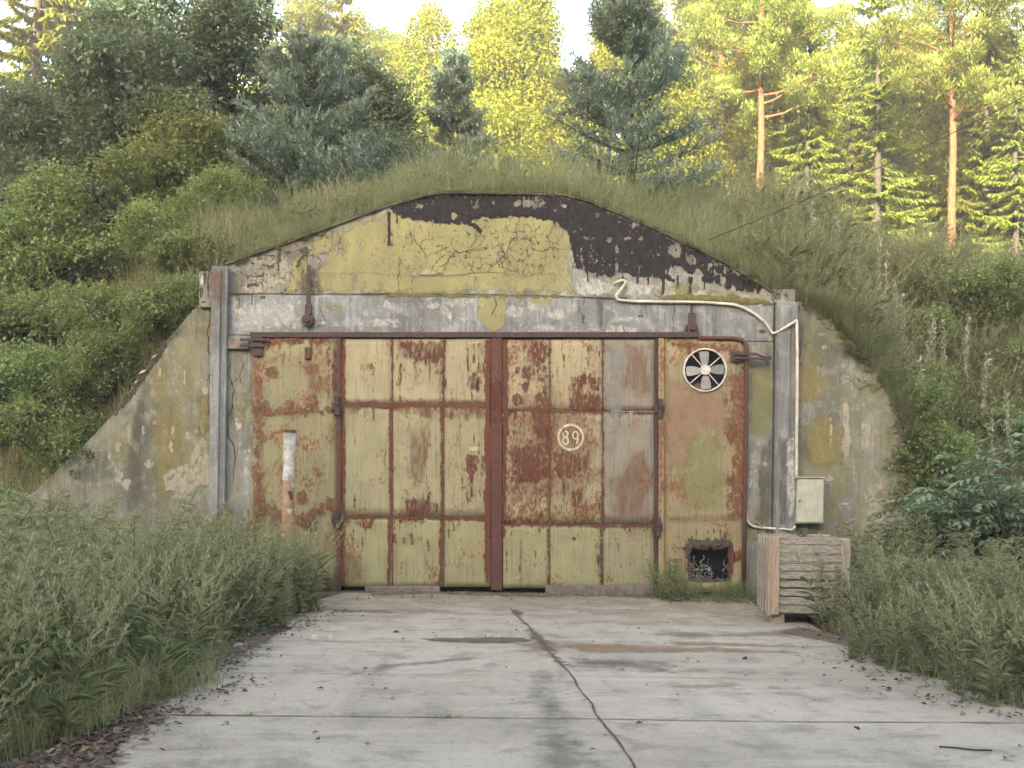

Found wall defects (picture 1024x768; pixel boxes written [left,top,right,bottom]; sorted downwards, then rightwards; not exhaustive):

peeling [235,212,678,306]
peeling [107,421,156,491]
peeling [163,418,209,498]
corrosion [251,338,337,541]
corrosion [345,496,373,551]
crack [206,217,627,486]
corrosion [392,340,486,569]
corrosion [511,341,601,517]
corrosion [667,328,745,575]
leakage [799,346,826,402]
leakage [808,398,871,485]
crack [510,607,636,768]